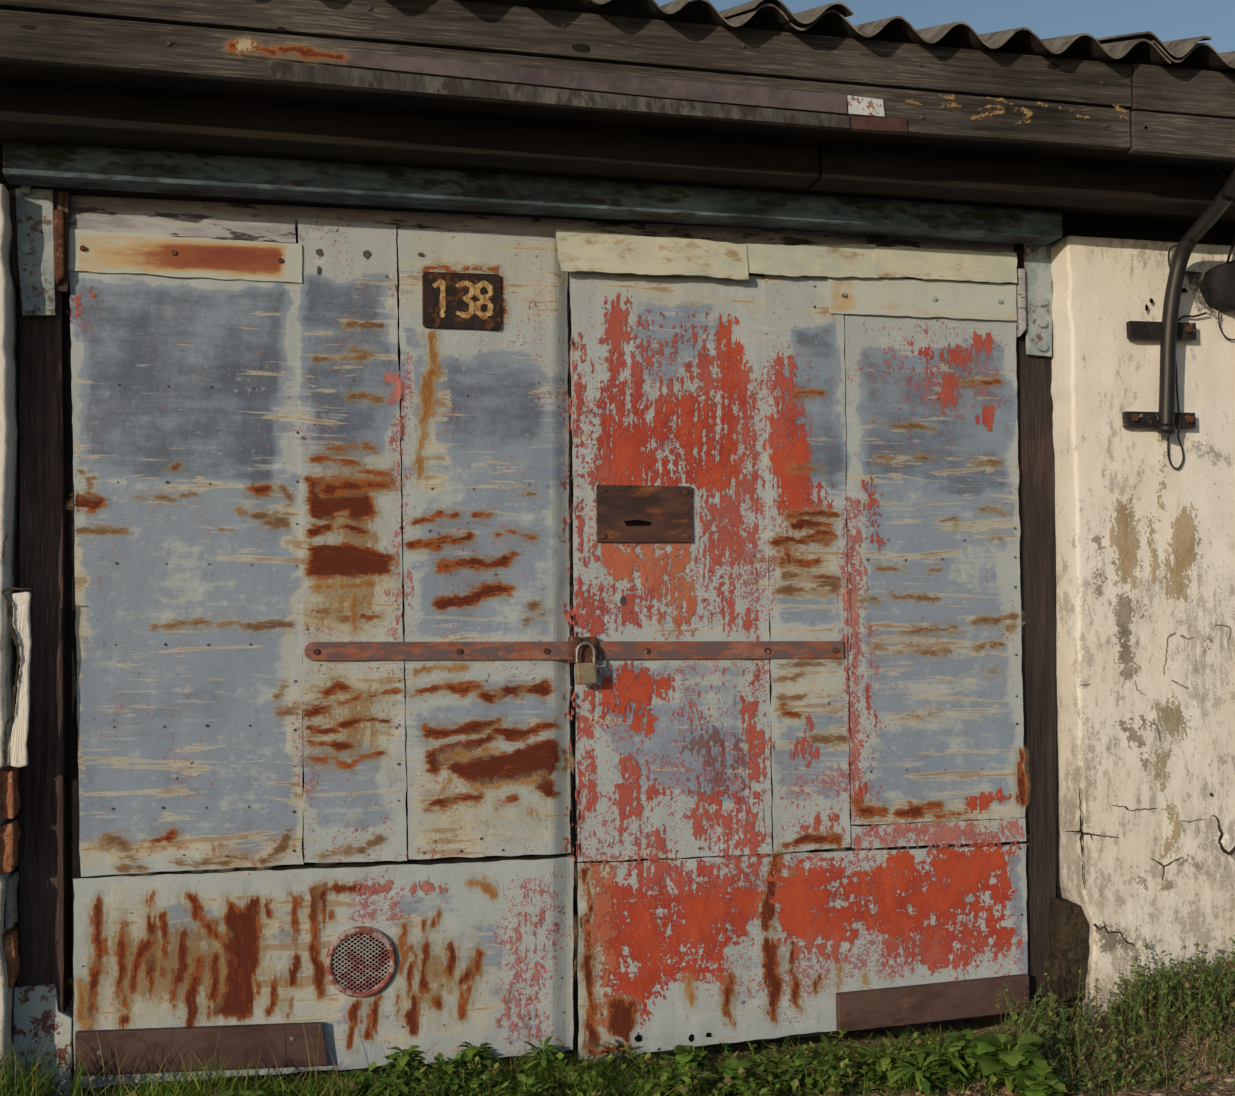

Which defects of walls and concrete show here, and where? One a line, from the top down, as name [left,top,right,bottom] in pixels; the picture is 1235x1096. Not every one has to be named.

peeling [888,331,996,417]
rust [217,442,520,635]
rust [272,663,574,820]
peeling [559,289,834,641]
peeling [562,476,1029,1039]
rust [767,509,842,597]
peeling [1091,534,1150,687]
crack [1134,624,1231,742]
crack [1065,788,1235,889]
rust [75,880,362,1030]
rust [346,910,485,1053]
crack [1093,921,1135,946]